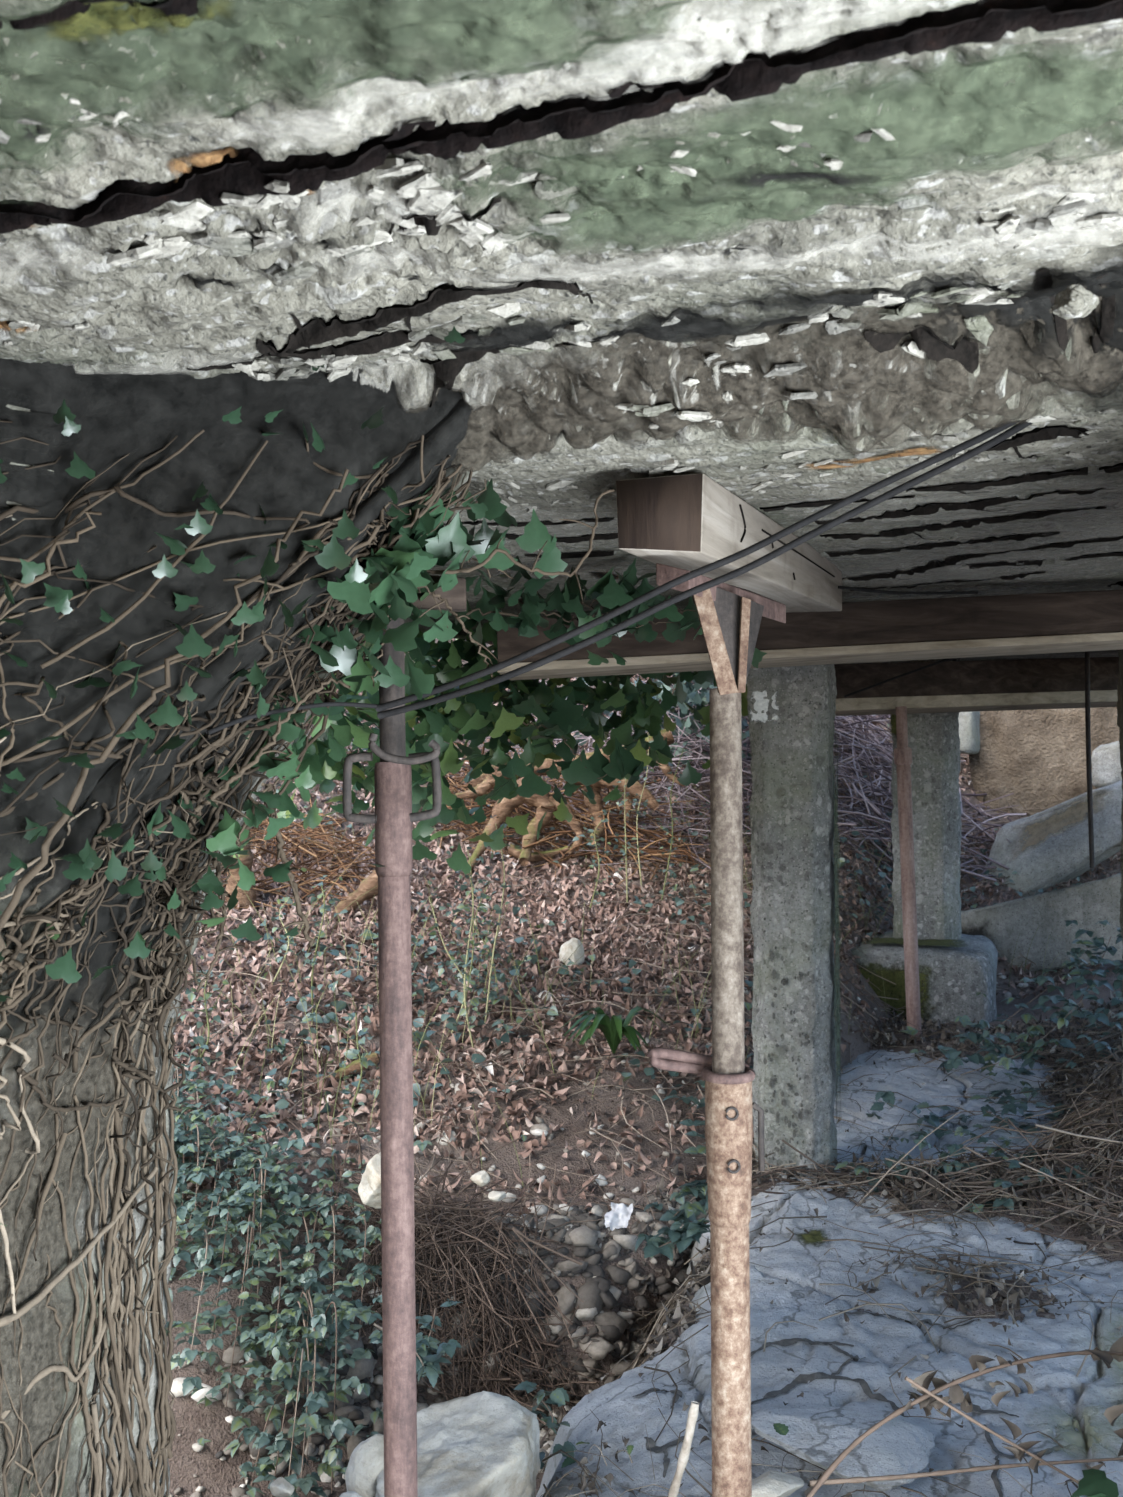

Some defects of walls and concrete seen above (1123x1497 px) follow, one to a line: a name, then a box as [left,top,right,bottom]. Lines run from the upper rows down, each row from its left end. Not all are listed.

crack [0,0,1123,236]
spalling [106,158,580,281]
spalling [3,320,40,346]
spalling [191,277,234,289]
spalling [232,302,526,382]
crack [187,277,593,408]
spalling [498,321,643,355]
spalling [661,308,684,326]
spalling [681,282,1029,400]
spalling [615,391,724,429]
spalling [739,409,1117,494]
crack [739,425,1123,591]